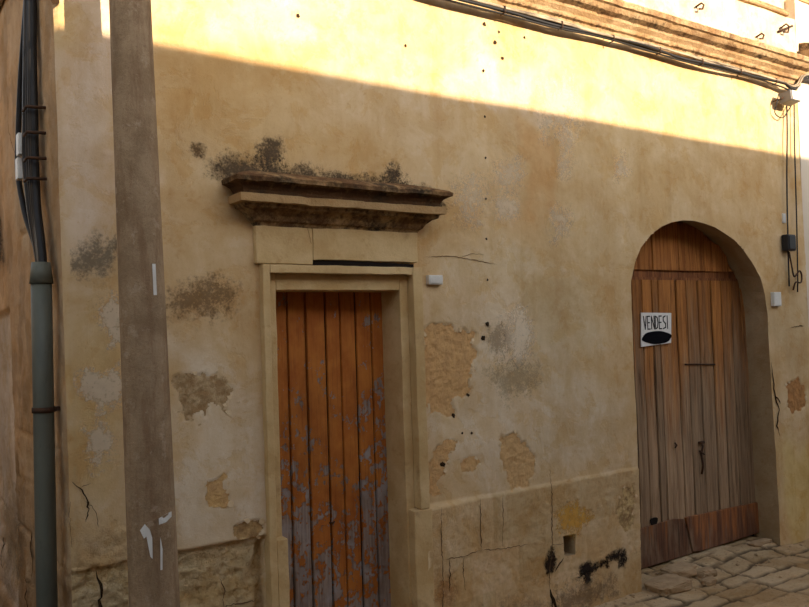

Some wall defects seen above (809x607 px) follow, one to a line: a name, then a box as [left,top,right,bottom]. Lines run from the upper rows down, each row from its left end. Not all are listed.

leakage [211,138,409,185]
leakage [72,239,117,276]
leakage [167,275,235,319]
peeling [424,322,485,418]
peeling [171,371,233,426]
spalling [785,377,807,414]
peeling [428,432,481,496]
peeling [499,430,538,492]
crack [73,483,98,524]
peeling [205,472,234,509]
crack [95,571,103,607]